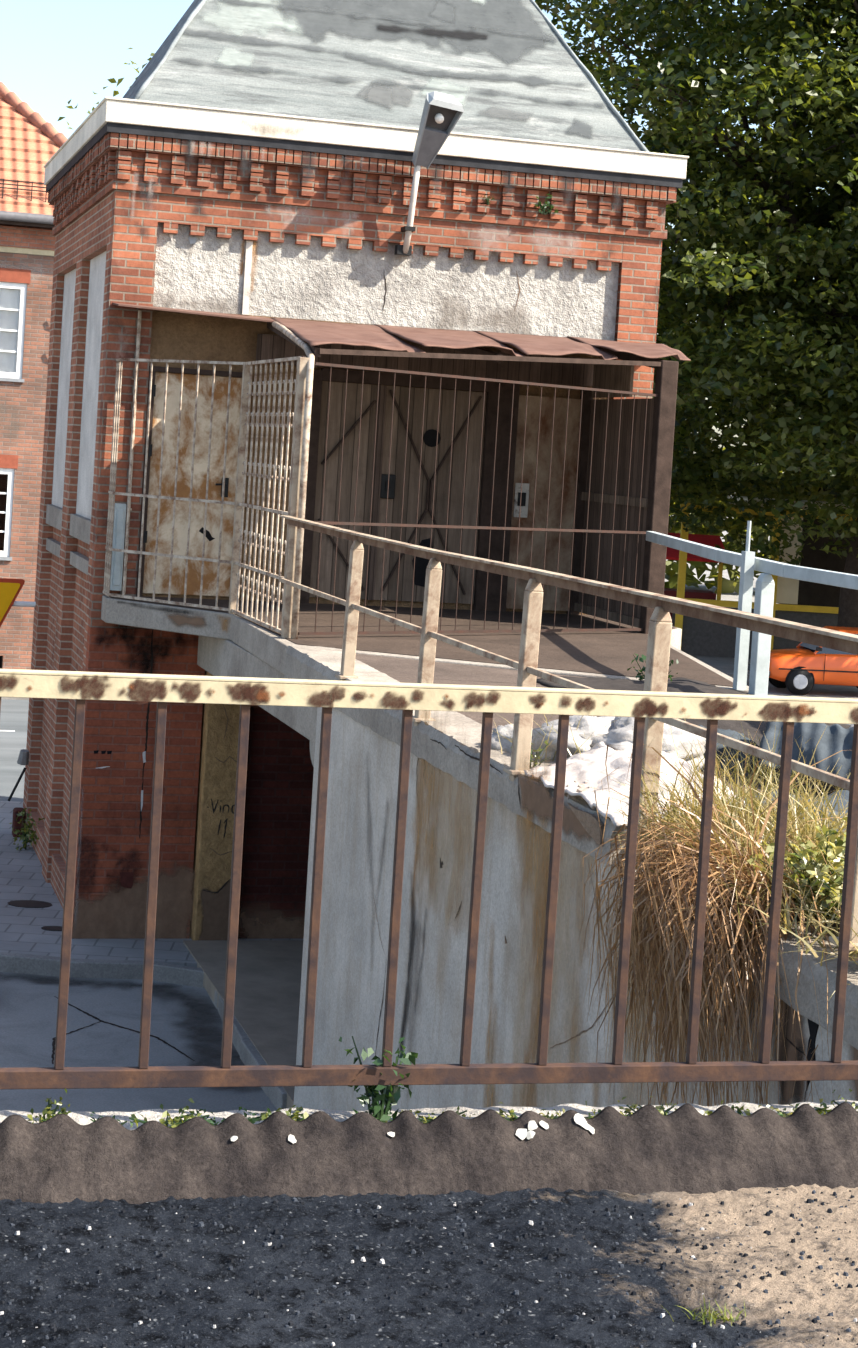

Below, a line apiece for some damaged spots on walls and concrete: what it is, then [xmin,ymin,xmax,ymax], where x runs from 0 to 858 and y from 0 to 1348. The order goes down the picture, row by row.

rust [0,675,32,690]
rust [61,676,285,705]
crack [51,996,195,1064]